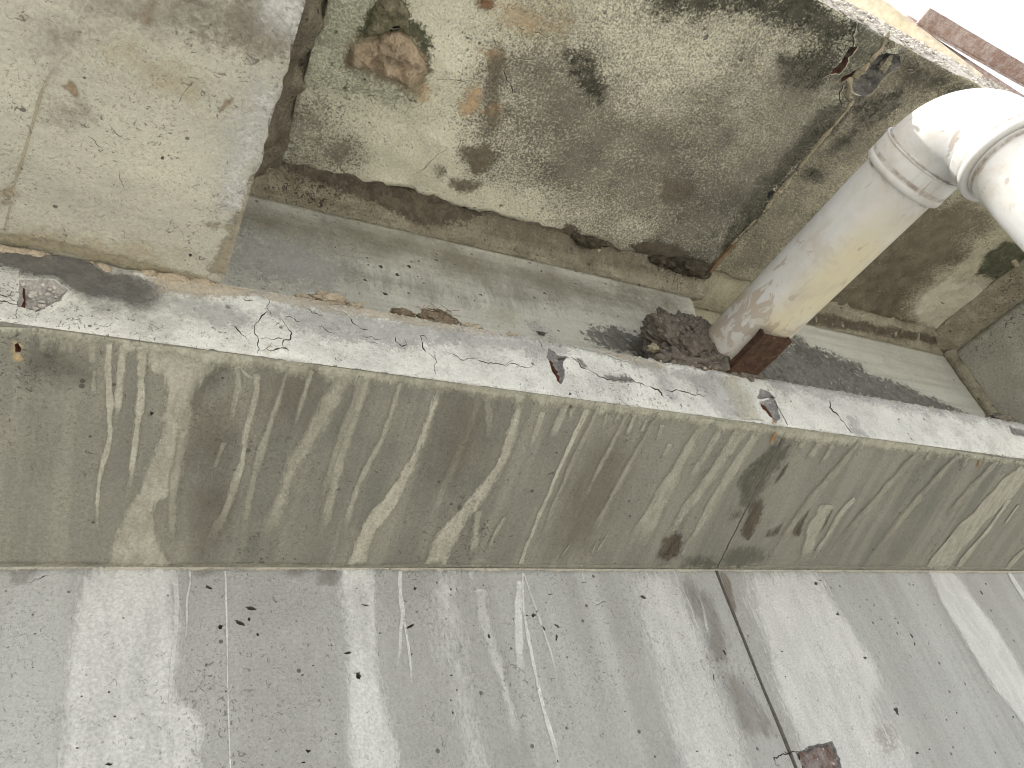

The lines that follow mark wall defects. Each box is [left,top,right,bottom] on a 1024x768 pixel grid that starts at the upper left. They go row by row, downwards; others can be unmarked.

damp [262,0,304,34]
spalling [831,31,902,102]
mould [281,73,370,180]
mould [436,0,977,281]
damp [0,86,353,307]
spalling [17,279,68,312]
damp [329,227,496,274]
damp [830,190,999,330]
crack [229,298,705,397]
spalling [546,348,567,384]
spalling [757,389,781,421]
damp [0,305,1024,768]